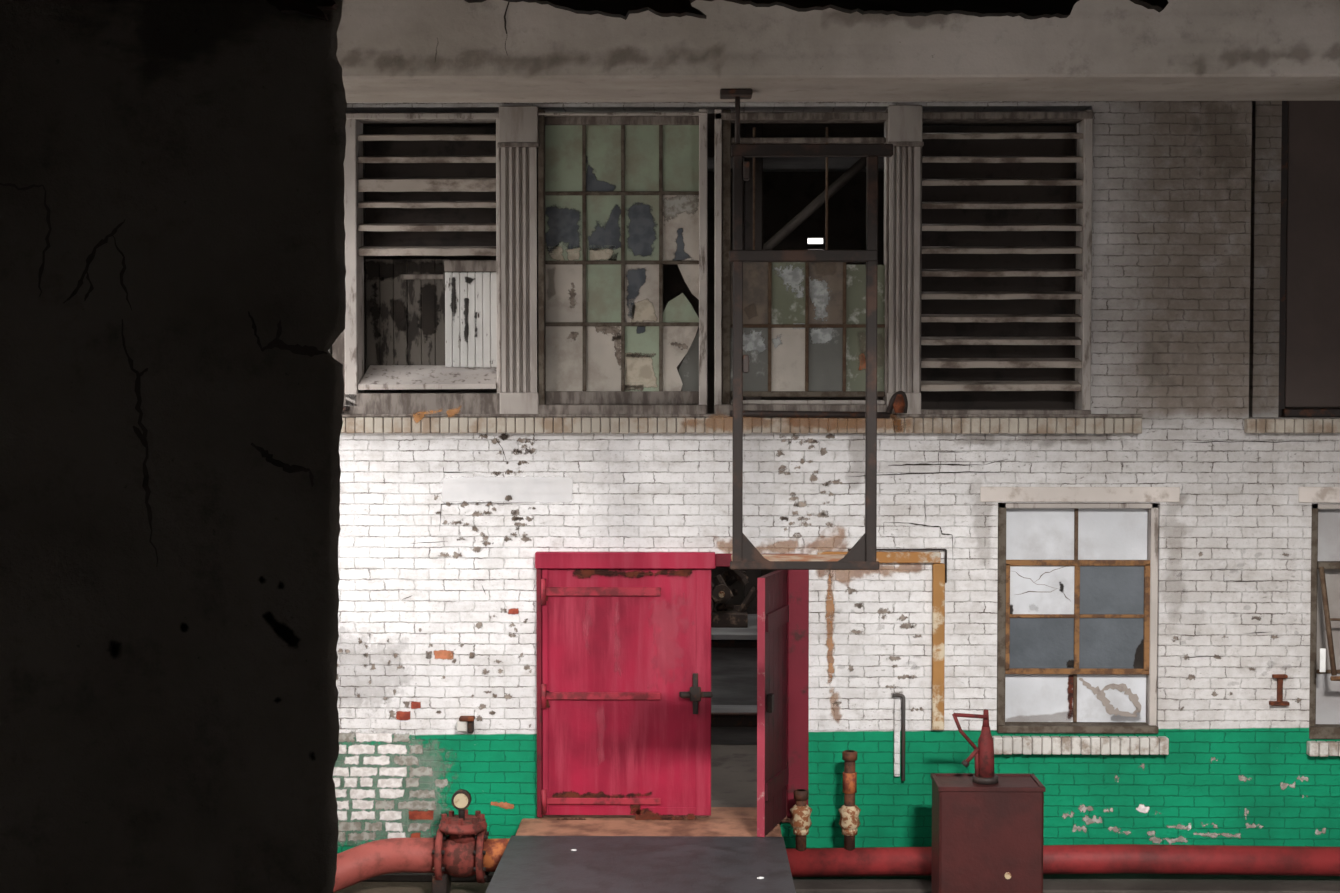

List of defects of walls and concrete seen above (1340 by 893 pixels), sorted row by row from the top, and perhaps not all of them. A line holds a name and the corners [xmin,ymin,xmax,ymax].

crack [0,183,158,567]
peeling [478,433,536,475]
peeling [776,434,842,538]
peeling [434,495,536,559]
corrosion [756,529,845,554]
peeling [475,608,528,637]
corrosion [818,563,921,722]
peeling [472,691,512,721]
peeling [333,687,448,842]
peeling [1280,776,1308,798]
peeling [1062,805,1131,835]
peeling [1147,808,1264,845]